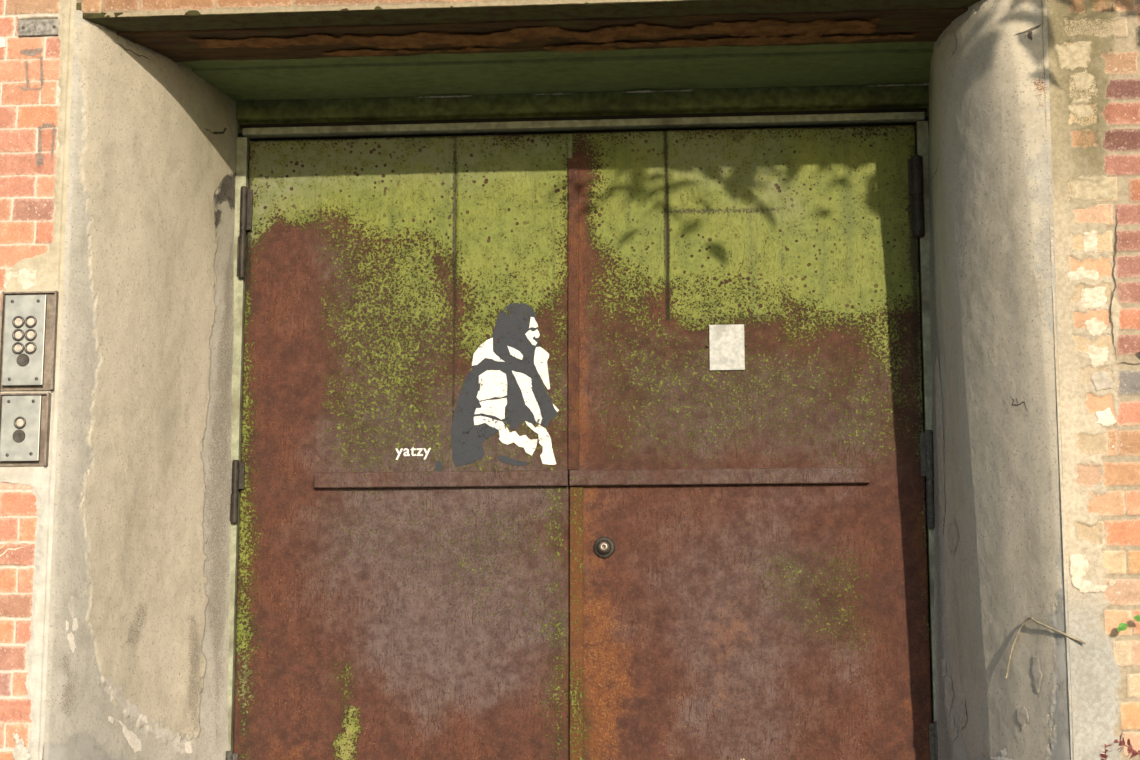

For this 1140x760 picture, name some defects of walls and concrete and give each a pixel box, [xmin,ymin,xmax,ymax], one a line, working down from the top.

crack [1109,207,1140,365]
spalling [12,733,30,760]